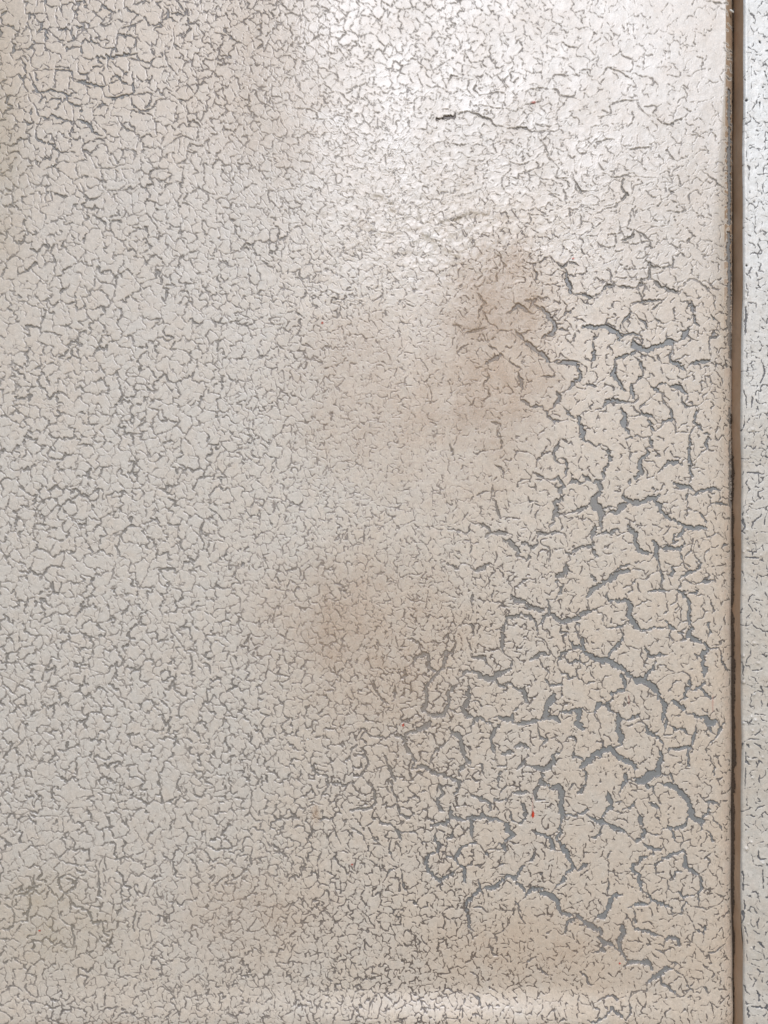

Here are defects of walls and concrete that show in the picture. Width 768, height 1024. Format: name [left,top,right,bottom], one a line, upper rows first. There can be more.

crack [596,79,642,121]
crack [555,261,580,270]
crack [563,268,575,295]
crack [572,274,616,300]
crack [642,377,668,394]
crack [664,382,690,403]
crack [646,402,680,434]
crack [551,441,570,480]
crack [554,555,572,588]
crack [528,650,551,662]
crack [374,811,403,842]
crack [641,840,666,858]